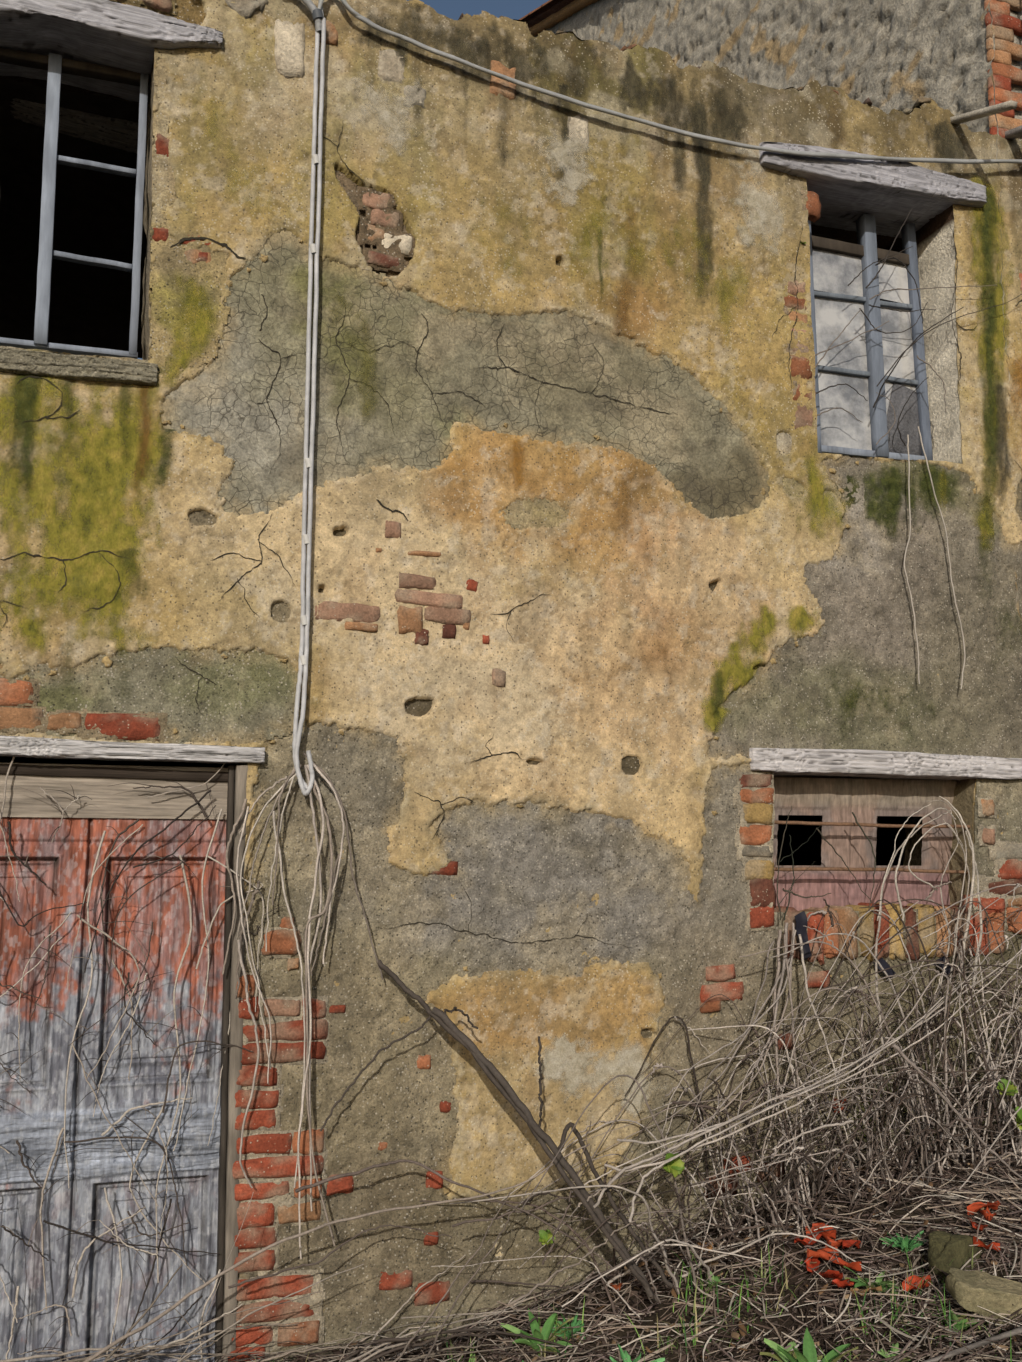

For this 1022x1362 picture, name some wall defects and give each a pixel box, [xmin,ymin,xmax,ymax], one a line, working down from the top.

flaking render [274,19,338,78]
flaking render [378,49,426,108]
damp [621,57,783,282]
damp [13,374,41,489]
damp [158,429,173,484]
crack [170,237,246,259]
crack [213,514,295,618]
crack [376,499,408,520]
flaking render [0,59,804,526]
crack [336,303,678,459]
damp [972,191,1022,493]
flaking render [0,455,1022,1362]